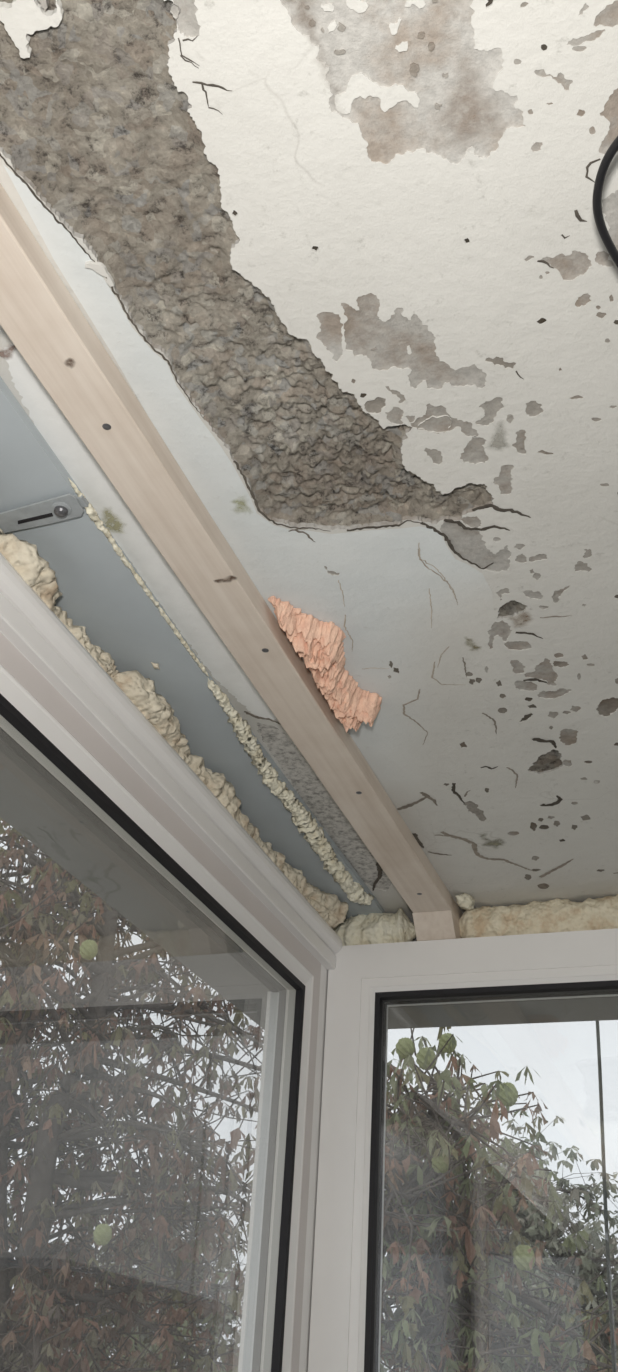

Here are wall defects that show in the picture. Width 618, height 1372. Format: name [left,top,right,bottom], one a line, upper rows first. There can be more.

crack [178,37,231,115]
crack [0,153,203,418]
spalling [0,0,618,730]
crack [234,461,531,744]
crack [480,713,563,806]
crack [532,729,579,748]
spalling [528,749,600,784]
crack [397,792,573,889]
spalling [530,802,590,842]